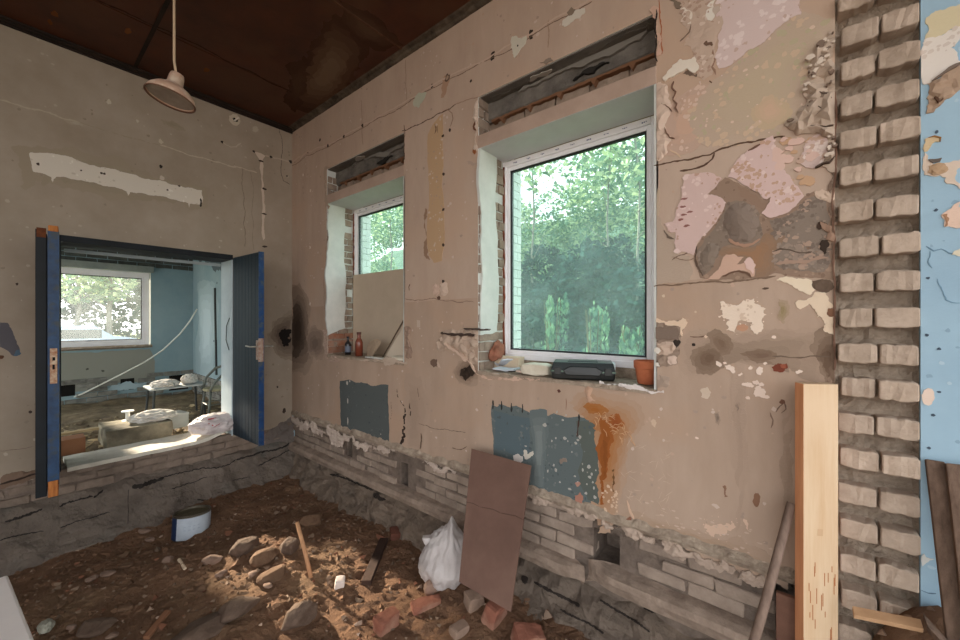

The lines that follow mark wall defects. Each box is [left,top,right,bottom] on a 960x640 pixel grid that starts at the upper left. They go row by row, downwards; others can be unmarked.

crack [160,1,592,246]
corrosion [491,53,655,125]
spalling [518,6,662,94]
crack [654,81,785,172]
peeling [657,0,838,335]
peeling [920,4,960,114]
peeling [922,137,960,189]
crack [0,443,289,541]
spalling [264,410,470,481]
crack [390,388,467,450]
corrosion [568,389,645,534]
spalling [527,435,795,588]